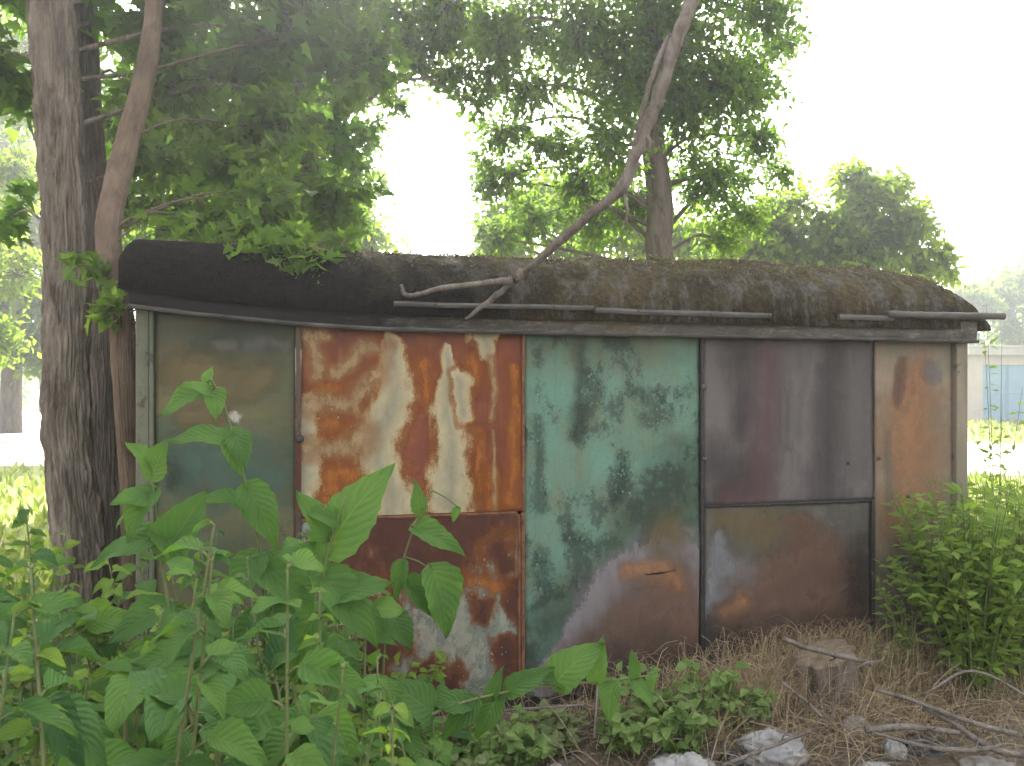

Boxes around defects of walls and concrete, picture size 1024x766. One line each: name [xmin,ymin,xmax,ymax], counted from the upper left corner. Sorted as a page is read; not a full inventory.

rust [410,354,434,407]
rust [464,354,487,392]
rust [894,357,906,406]
rust [319,460,362,505]
rust [326,362,521,692]
rust [576,529,867,691]